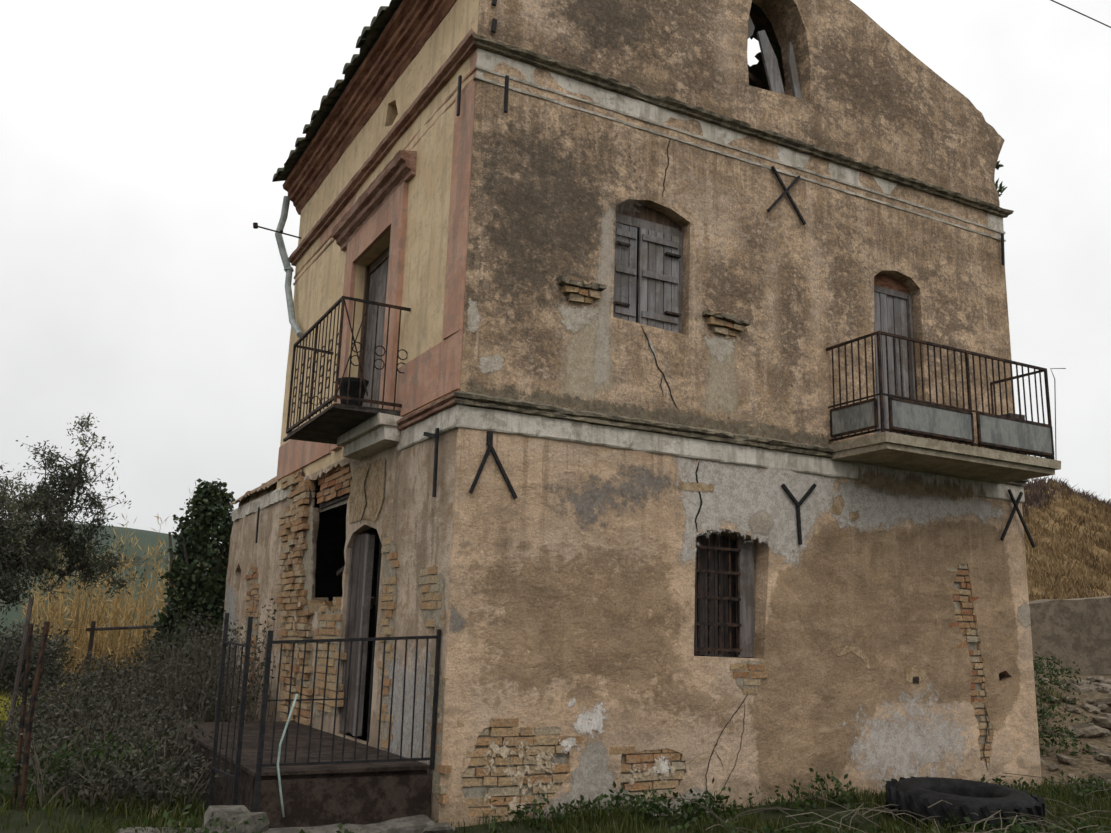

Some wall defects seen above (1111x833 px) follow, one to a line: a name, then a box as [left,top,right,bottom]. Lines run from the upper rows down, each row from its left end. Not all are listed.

crack [663,135,672,192]
peeling [556,275,601,335]
crack [642,327,678,408]
peeling [704,311,745,362]
crack [695,461,703,532]
flaking render [242,559,260,715]
flaking render [275,470,347,727]
flaking render [947,564,1005,764]
flaking render [429,667,609,826]
flaking render [609,746,707,798]